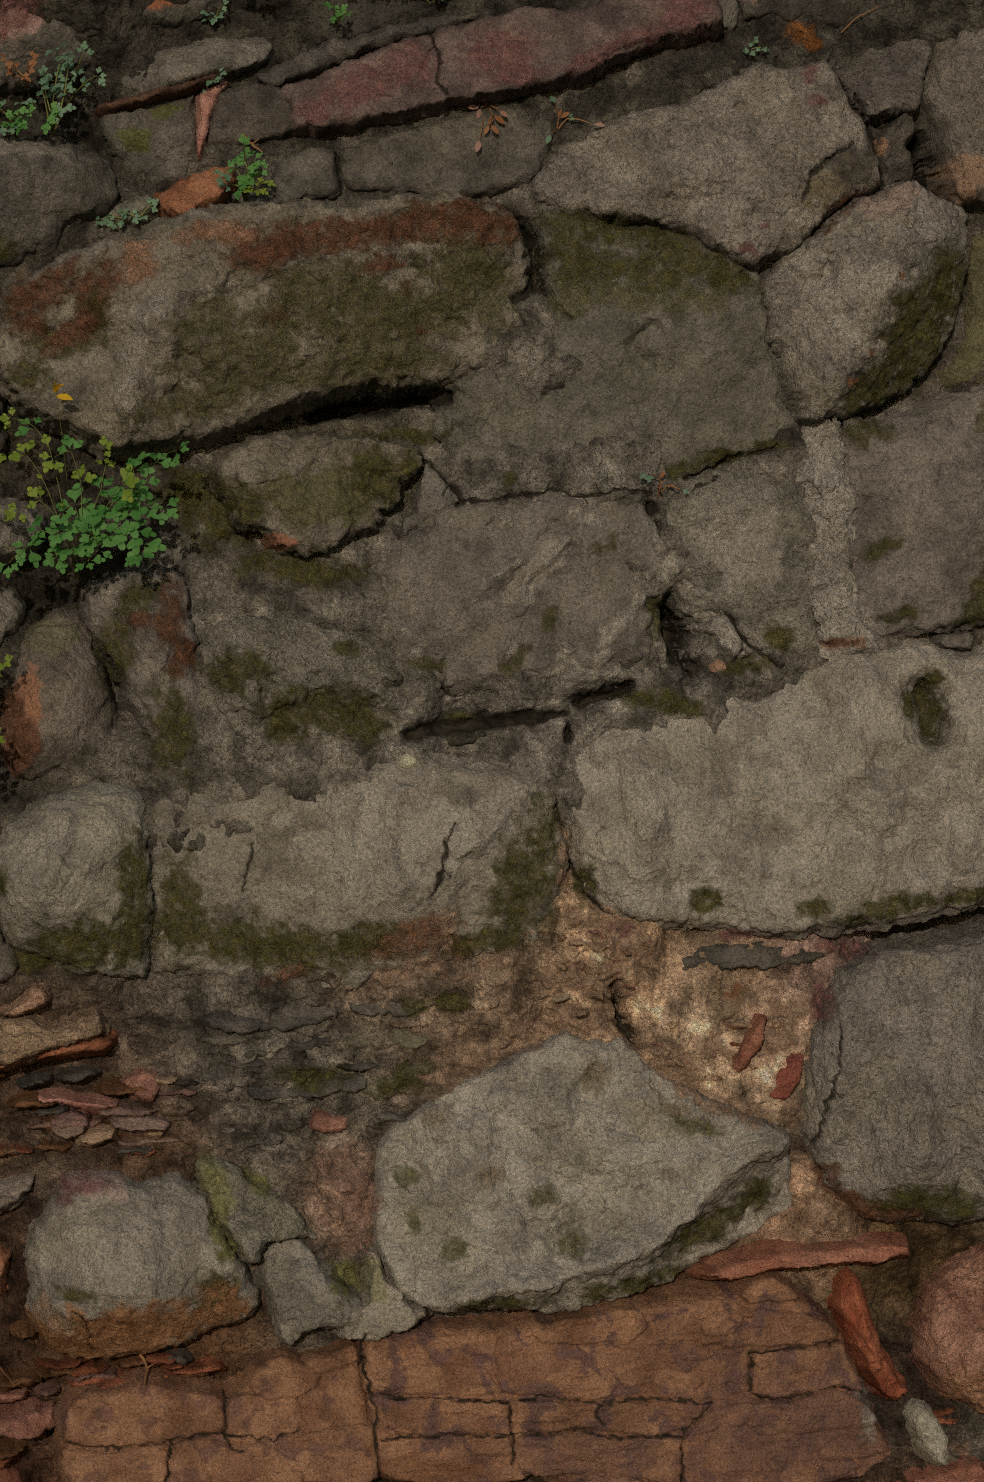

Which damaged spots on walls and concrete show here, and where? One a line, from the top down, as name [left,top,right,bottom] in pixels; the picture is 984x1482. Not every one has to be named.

crack [431,823,456,896]